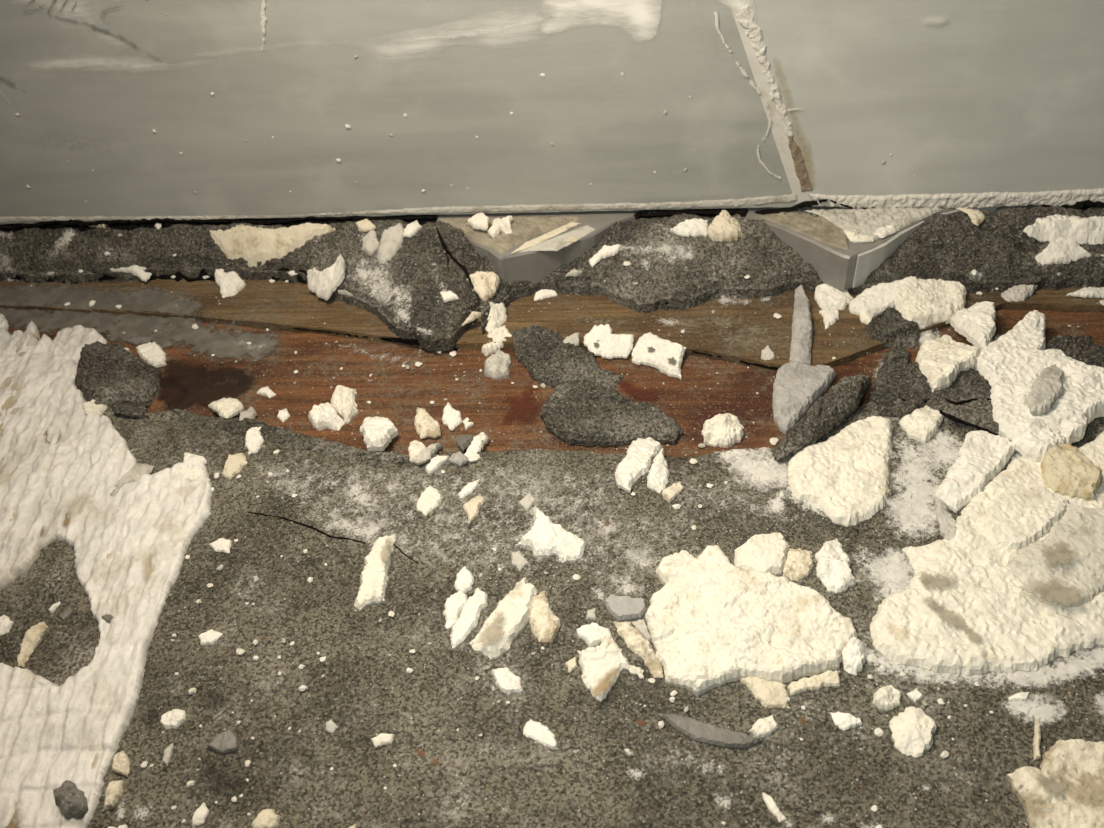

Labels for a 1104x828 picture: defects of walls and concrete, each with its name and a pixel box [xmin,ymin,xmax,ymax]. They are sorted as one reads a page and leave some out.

flaking render [467,212,513,239]
flaking render [565,244,622,277]
flaking render [1035,237,1091,266]
flaking render [1001,284,1038,302]
flaking render [1066,287,1104,298]
flaking render [136,342,167,368]
water stain [160,360,253,411]
flaking render [899,405,944,444]
crack [248,512,366,544]
flaking render [0,615,14,636]
flaking render [17,601,75,668]
flaking render [103,751,131,811]